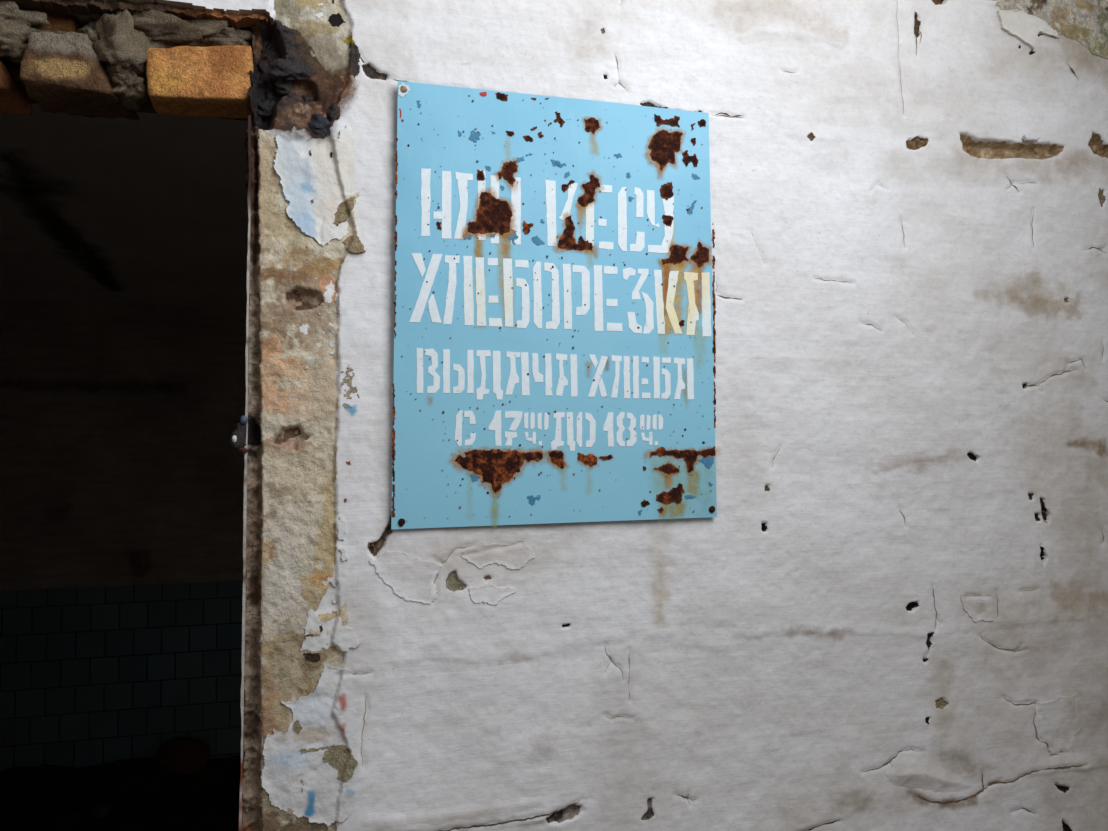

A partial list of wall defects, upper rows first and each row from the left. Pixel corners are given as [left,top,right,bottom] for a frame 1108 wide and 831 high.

peeling [995,0,1108,60]
spalling [960,132,1064,160]
spalling [1088,133,1108,158]
spalling [0,0,387,831]
crack [914,699,1087,804]
crack [438,799,581,831]